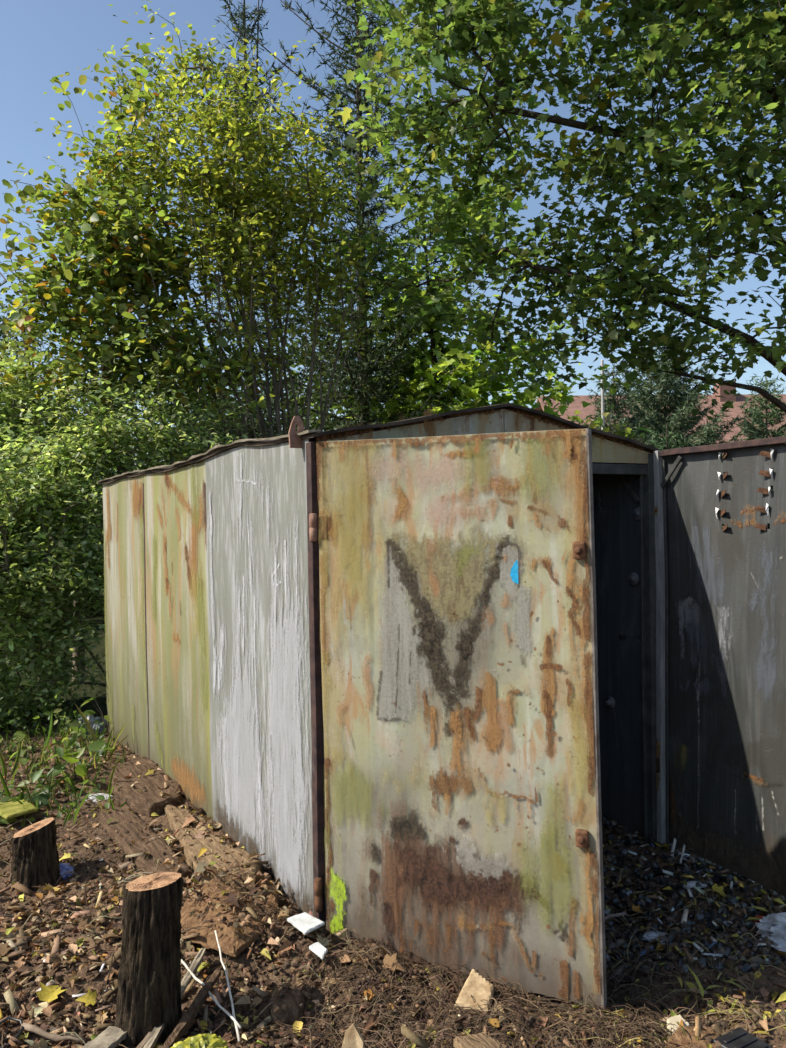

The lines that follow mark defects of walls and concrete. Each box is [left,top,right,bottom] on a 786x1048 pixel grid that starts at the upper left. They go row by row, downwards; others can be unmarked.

corrosion [133,480,143,516]
corrosion [163,539,172,616]
corrosion [158,472,203,600]
corrosion [316,409,642,823]
corrosion [324,758,335,930]
corrosion [558,849,601,999]